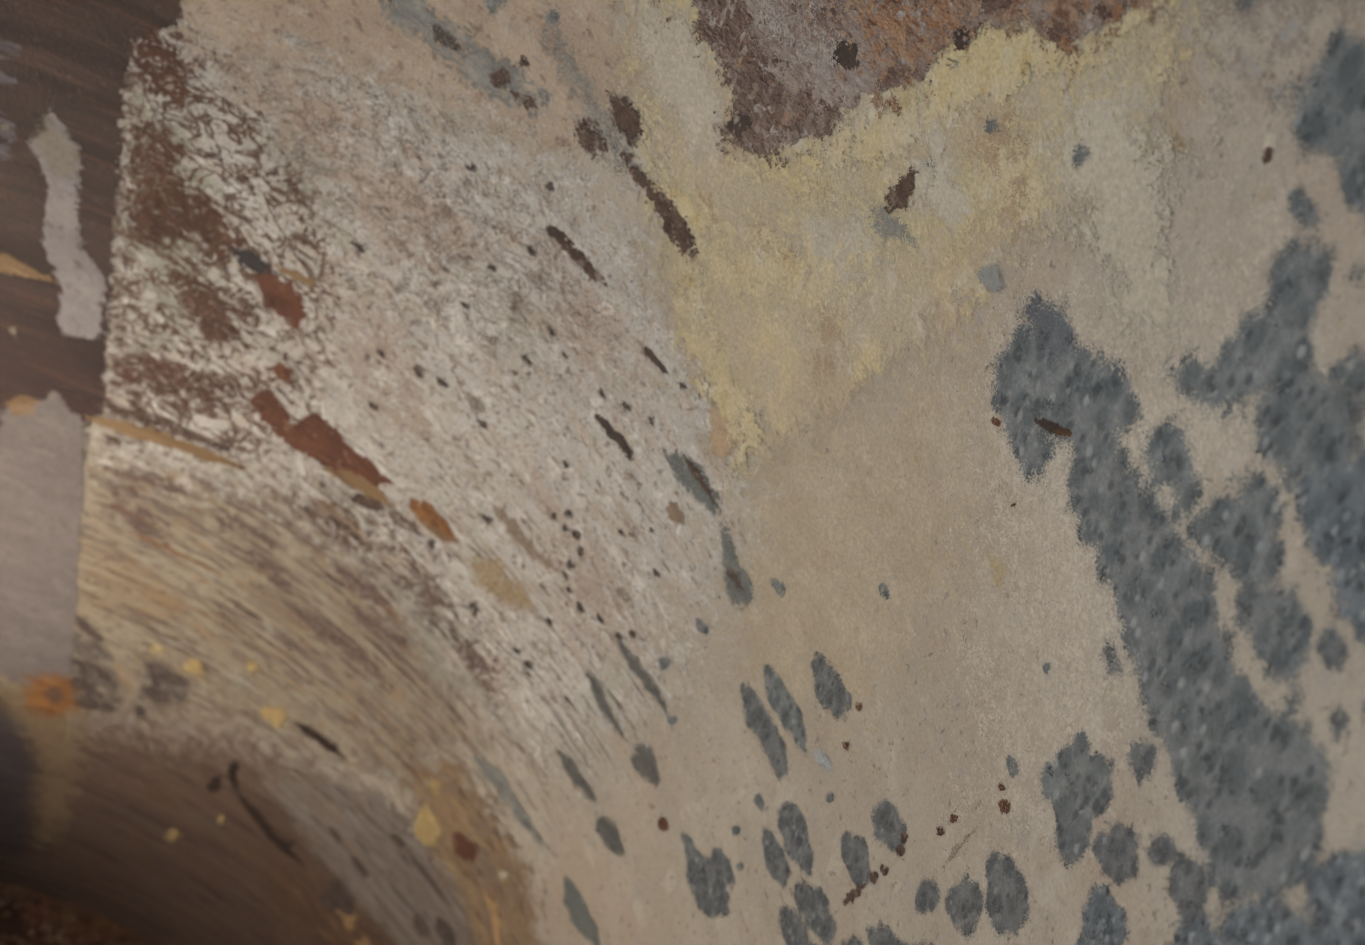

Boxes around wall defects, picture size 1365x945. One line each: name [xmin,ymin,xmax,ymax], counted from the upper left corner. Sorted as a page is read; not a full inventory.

peeling [0,39,21,86]
peeling [0,100,109,340]
rust [0,0,462,548]
spalling [1262,130,1279,164]